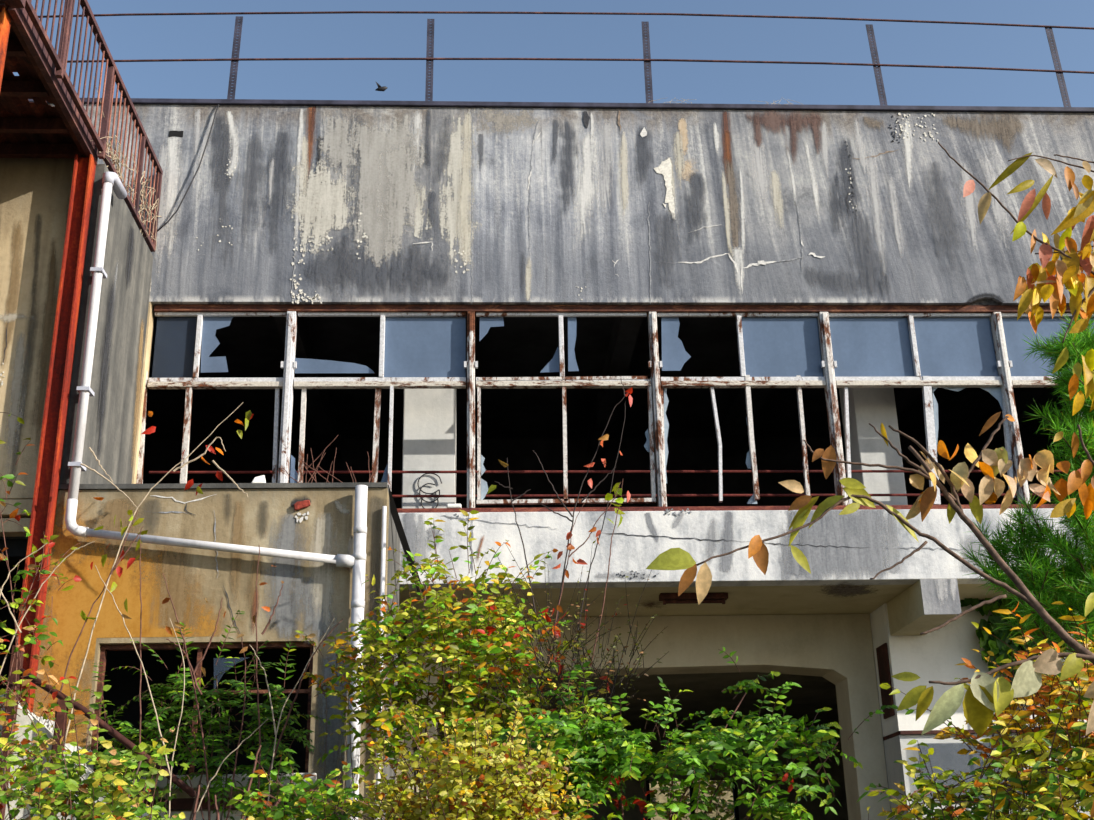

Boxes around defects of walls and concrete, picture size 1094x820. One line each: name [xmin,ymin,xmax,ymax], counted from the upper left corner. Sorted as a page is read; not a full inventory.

corrosion [3,225,22,361]
corrosion [34,242,57,433]
damp [156,138,180,255]
damp [193,109,303,252]
damp [553,110,651,237]
peeling [654,118,694,220]
corrosion [722,111,739,249]
crack [672,198,825,288]
damp [722,141,796,291]
corrosion [747,111,822,160]
damp [805,116,901,293]
spalling [291,498,311,523]